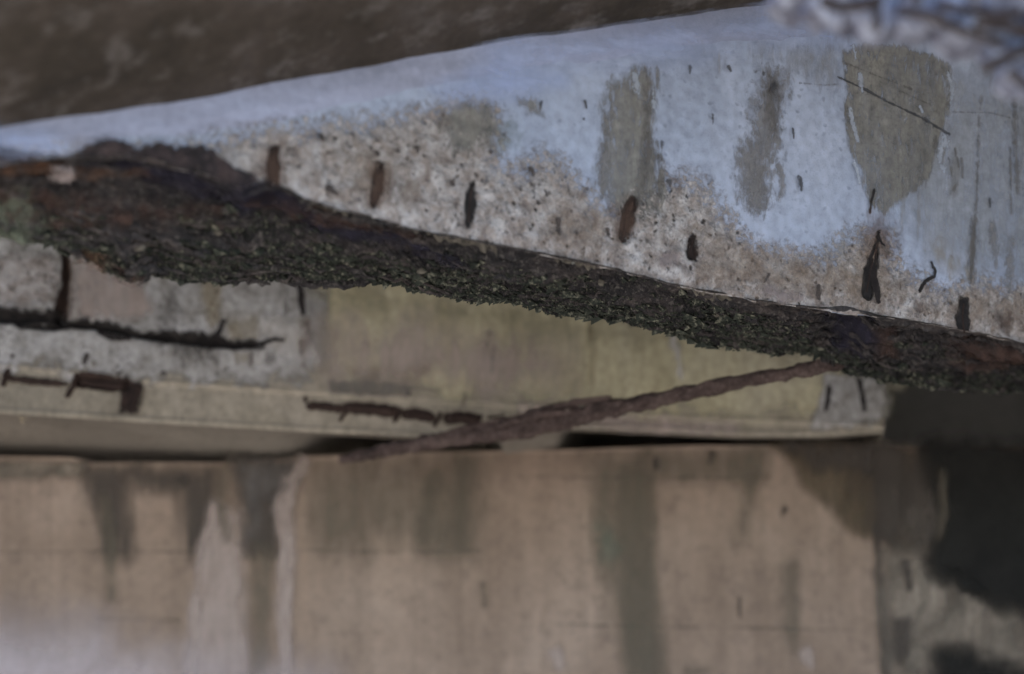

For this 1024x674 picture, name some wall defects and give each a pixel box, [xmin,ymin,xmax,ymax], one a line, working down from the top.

spalling [0,92,1024,343]
damp [598,65,666,222]
damp [737,66,792,213]
corrosion [119,380,143,415]
crack [0,255,306,353]
spalling [0,236,505,427]
corrosion [339,359,845,464]
damp [82,453,309,674]
damp [775,437,1024,674]